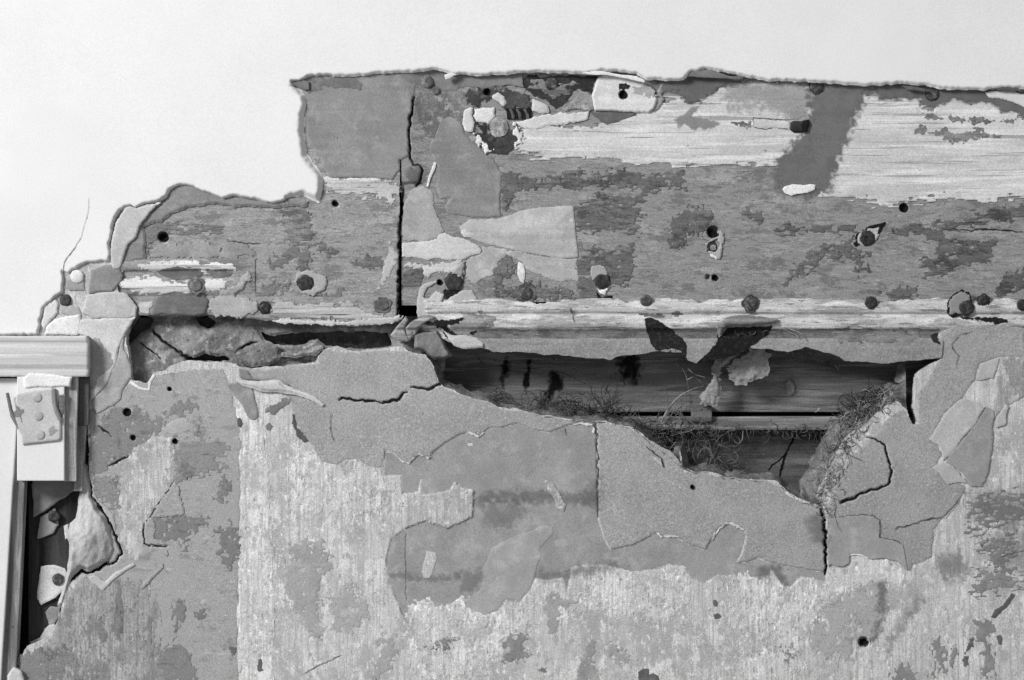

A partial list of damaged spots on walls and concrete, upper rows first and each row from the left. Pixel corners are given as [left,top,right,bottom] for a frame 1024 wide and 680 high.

peeling [740,86,1024,301]
crack [329,383,441,441]
flaking render [7,70,907,680]
peeling [832,326,923,344]
peeling [949,292,970,315]
crack [592,424,600,514]
crack [820,437,960,574]